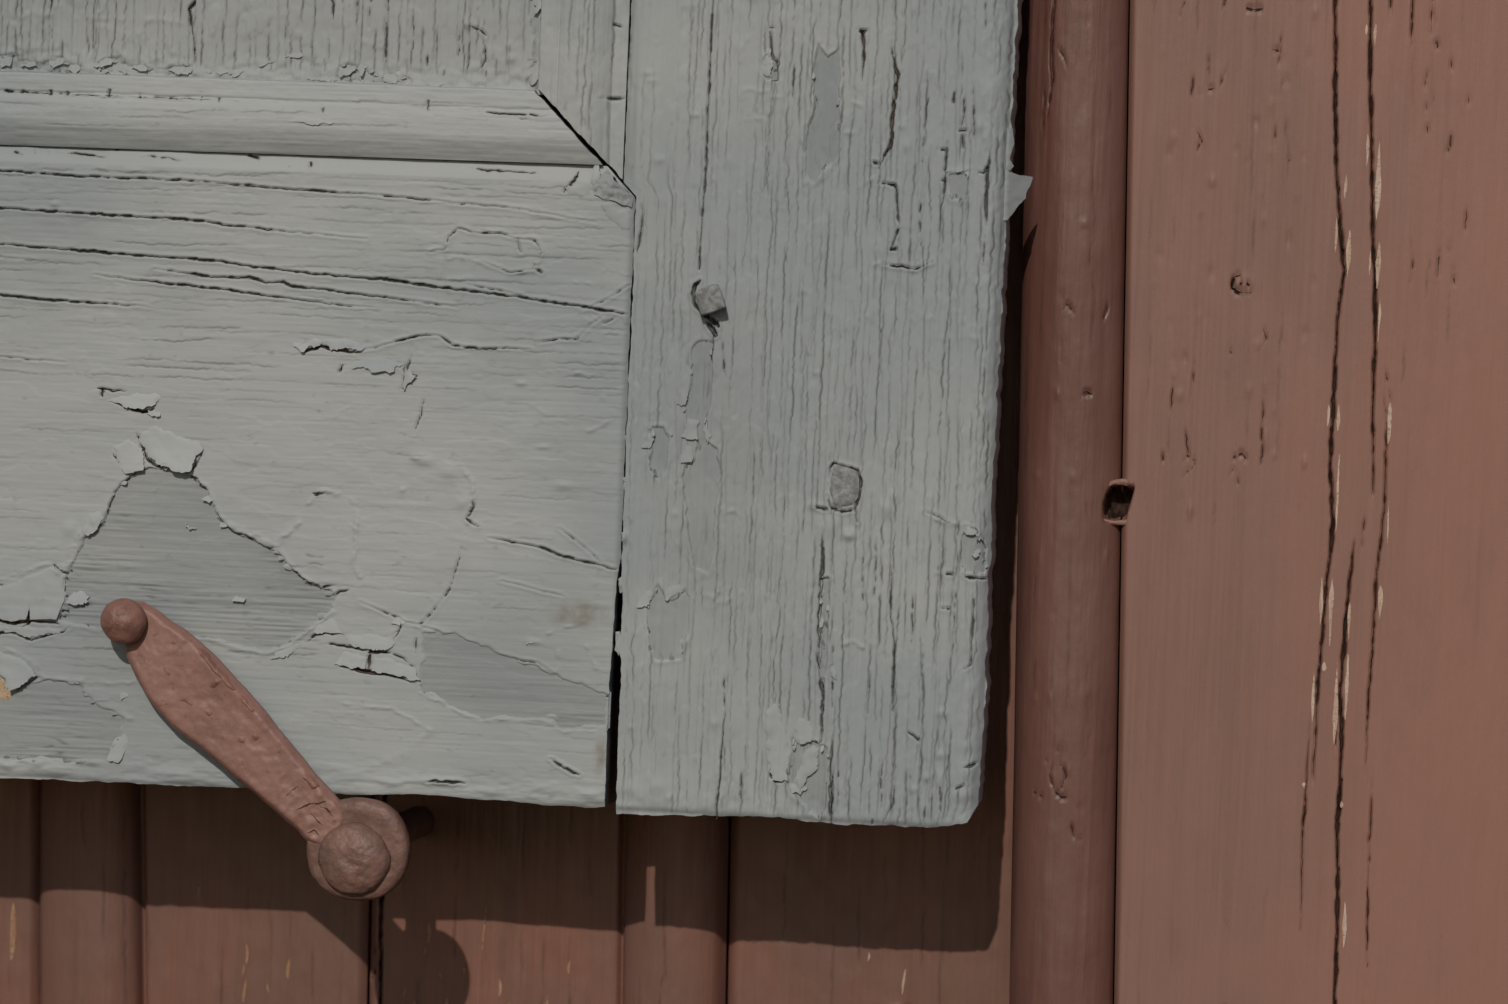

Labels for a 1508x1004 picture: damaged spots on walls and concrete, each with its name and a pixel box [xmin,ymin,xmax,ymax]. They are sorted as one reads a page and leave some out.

crack [0,149,627,429]
peeling [292,338,415,391]
crack [329,0,486,69]
crack [692,7,725,372]
crack [859,29,990,270]
peeling [0,651,129,764]
peeling [0,393,611,730]
crack [466,499,616,570]
crack [716,681,781,820]
peeling [764,703,832,818]
crack [816,463,986,822]
crack [1300,0,1469,1004]